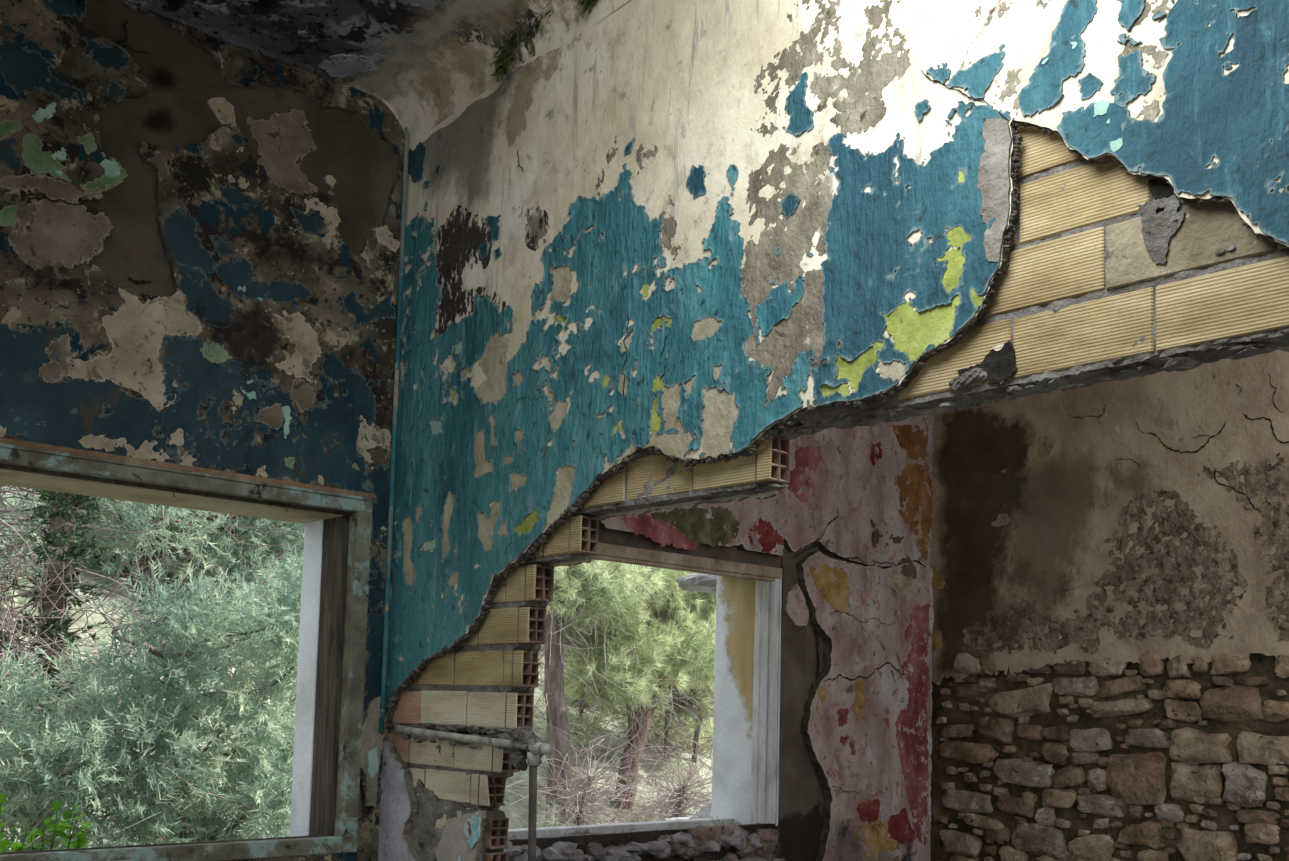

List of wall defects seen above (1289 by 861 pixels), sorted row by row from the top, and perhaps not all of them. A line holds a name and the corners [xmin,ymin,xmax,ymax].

flaking render [0,0,400,548]
peeling [360,0,1289,861]
crack [1069,404,1106,423]
crack [1117,373,1289,514]
crack [793,516,908,590]